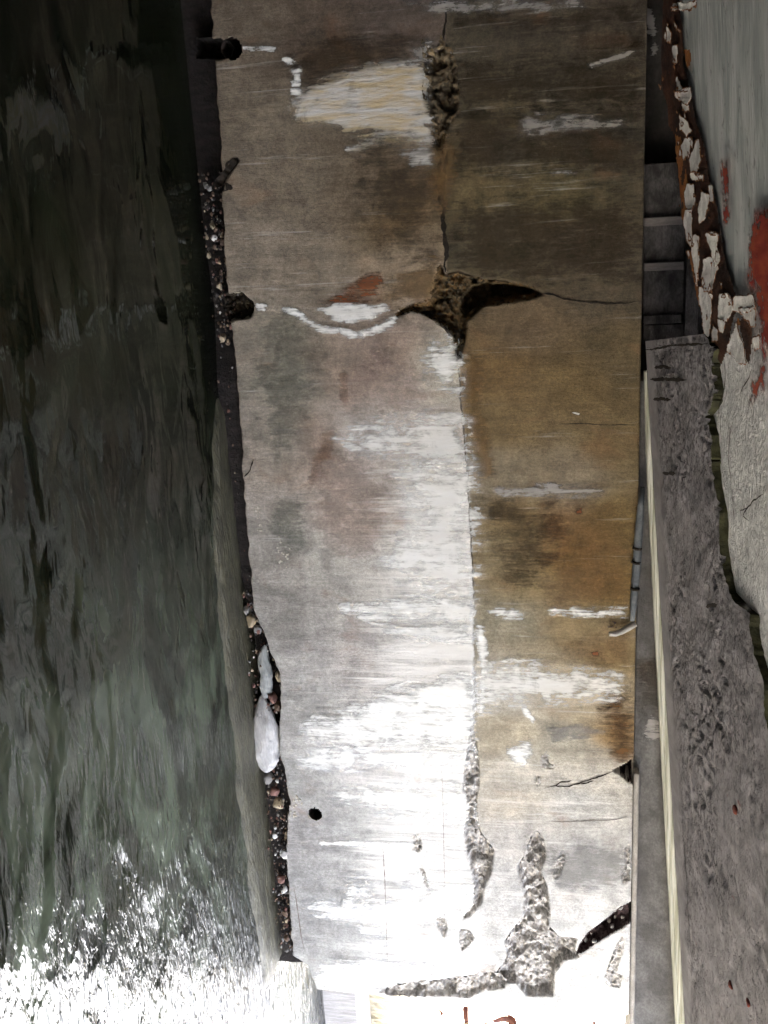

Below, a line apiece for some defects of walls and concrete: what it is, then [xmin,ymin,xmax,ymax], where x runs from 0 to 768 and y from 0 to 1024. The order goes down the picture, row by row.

leakage [293,35,642,250]
peeling [647,0,761,365]
rust [661,0,768,405]
rust [325,272,383,305]
spalling [395,260,539,359]
crack [536,291,636,305]
leakage [297,337,627,821]
crack [545,771,613,788]
hole [411,834,421,852]
spalling [551,847,566,881]
hole [434,916,475,952]
spalling [603,937,625,988]